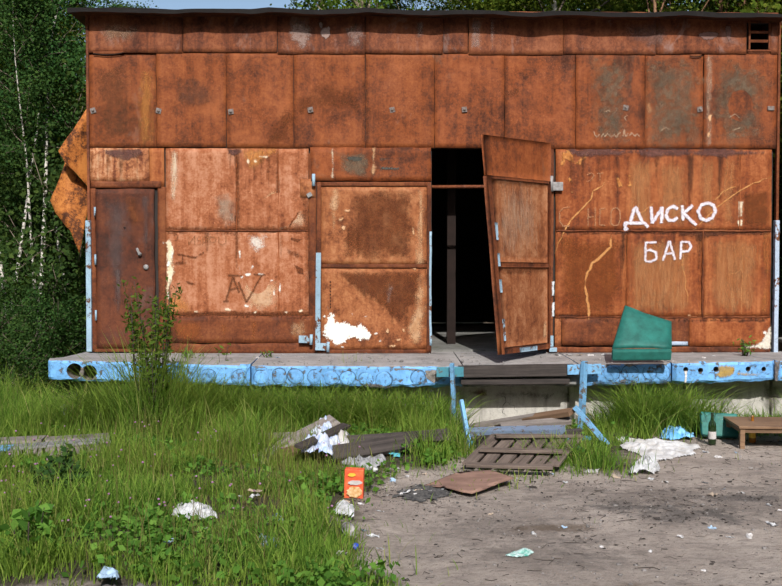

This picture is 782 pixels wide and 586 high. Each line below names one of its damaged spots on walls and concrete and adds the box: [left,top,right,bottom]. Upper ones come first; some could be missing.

rust [228,113,290,223]
rust [566,148,753,190]
rust [346,191,412,257]
peeling [166,241,174,299]
rust [172,298,304,338]
peeling [323,313,389,347]
rust [343,271,419,321]
peeling [391,288,423,347]
rust [559,192,768,321]